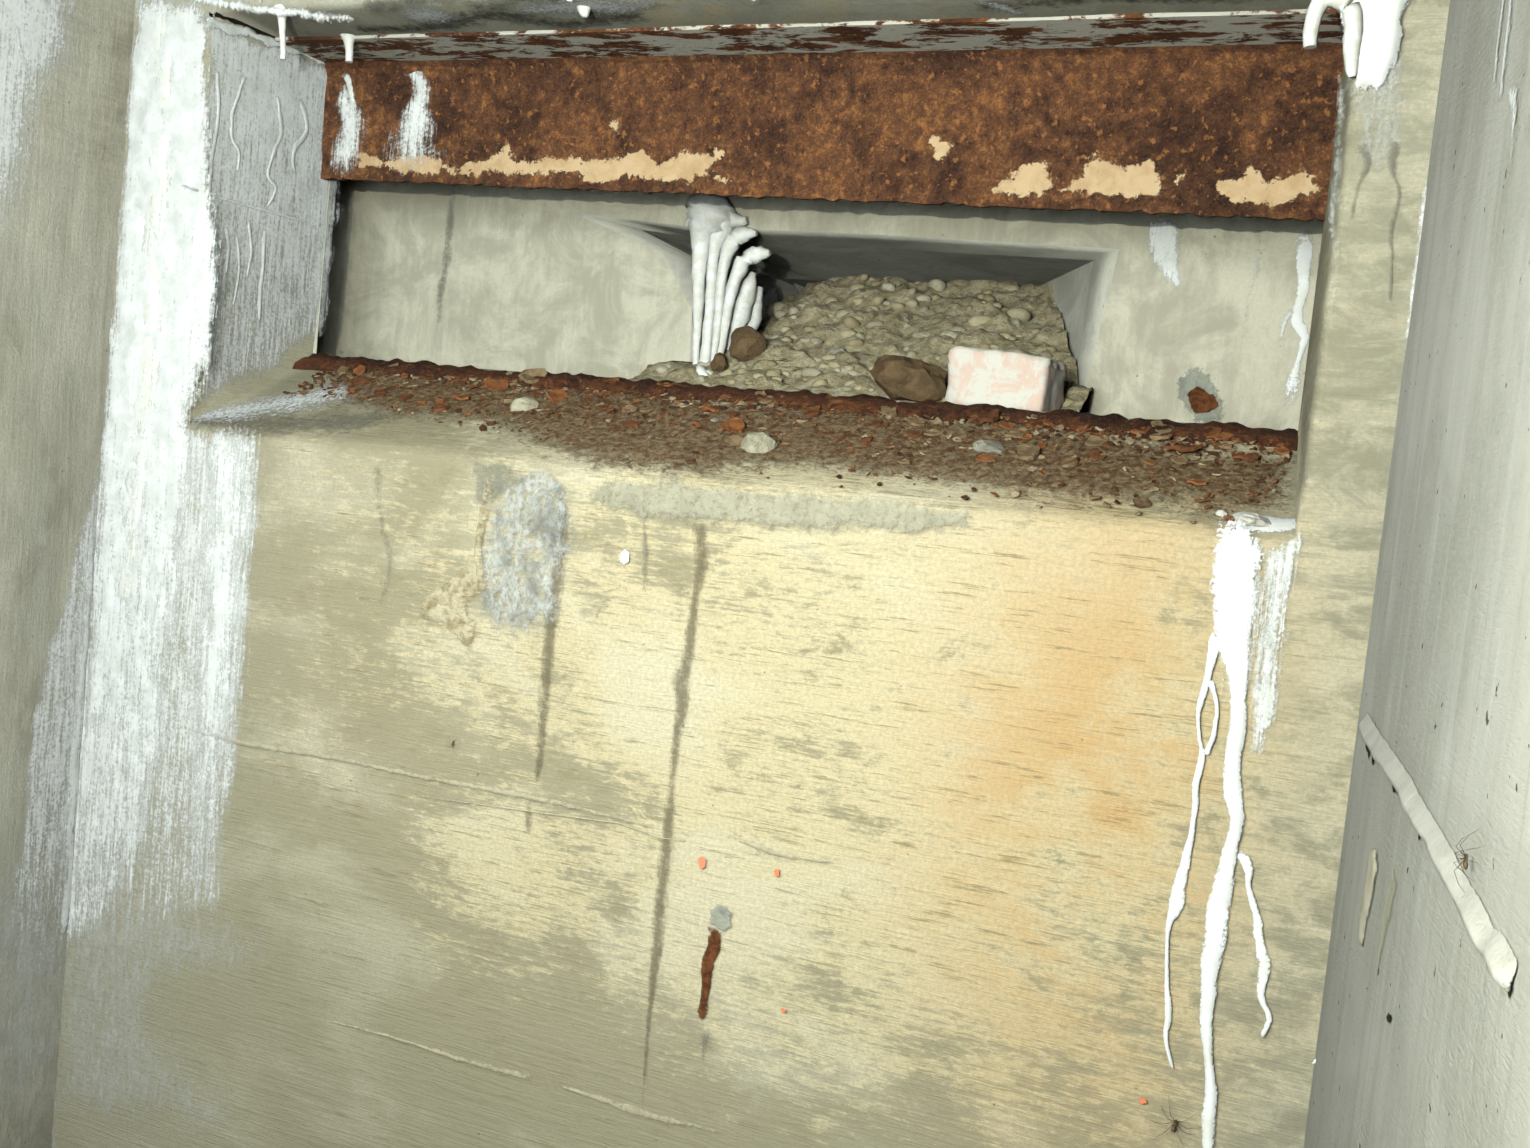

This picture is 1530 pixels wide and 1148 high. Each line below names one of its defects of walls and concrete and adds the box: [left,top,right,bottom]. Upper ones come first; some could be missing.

damp [980,0,1081,17]
damp [1340,0,1410,91]
damp [1280,229,1320,404]
damp [1405,187,1427,337]
corrosion [1187,386,1218,414]
damp [0,0,655,974]
damp [643,527,705,1075]
damp [1163,515,1301,1148]
corrosion [697,928,720,1019]